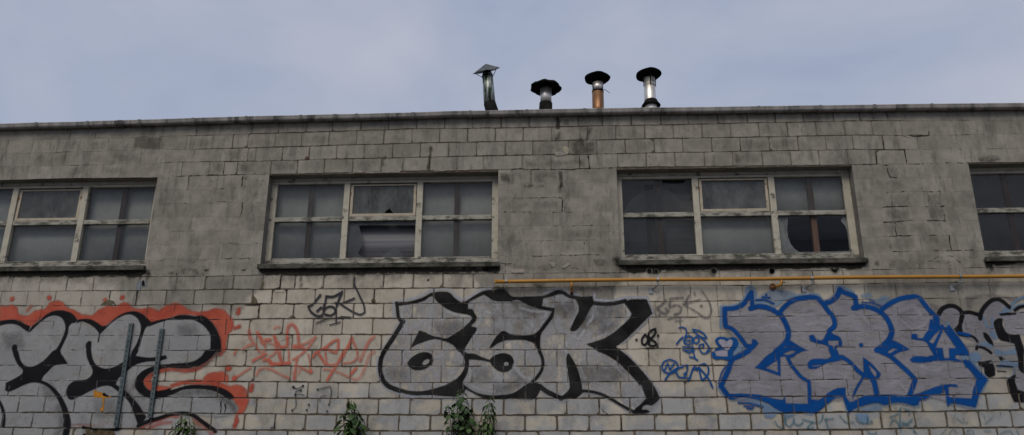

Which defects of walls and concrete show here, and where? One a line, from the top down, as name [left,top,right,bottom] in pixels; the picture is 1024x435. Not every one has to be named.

crack [850,132,977,265]